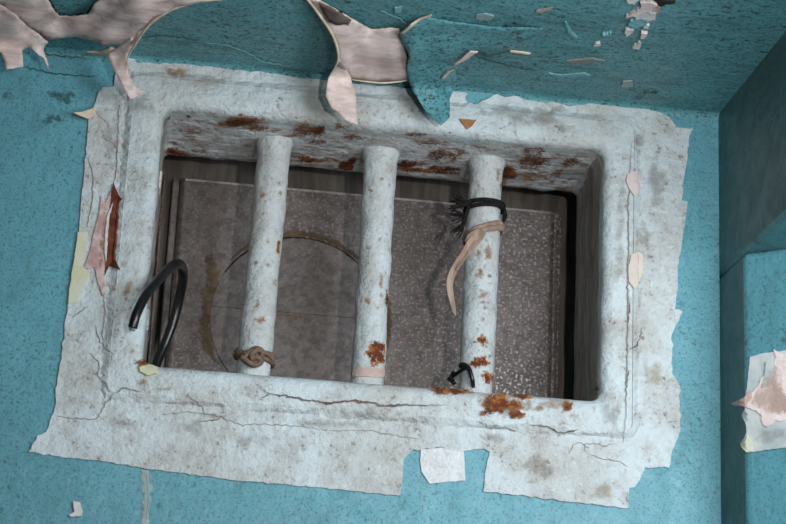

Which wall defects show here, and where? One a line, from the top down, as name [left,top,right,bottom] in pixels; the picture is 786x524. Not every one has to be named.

spalling [625,0,676,50]
corrosion [218,114,268,132]
peeling [0,0,543,267]
corrosion [397,132,466,175]
peeling [29,91,693,509]
corrosion [364,280,392,367]
crack [61,302,141,420]
corrosion [470,356,494,384]
crack [164,396,419,439]
crack [256,384,441,407]
corrosion [481,393,541,419]
spalling [731,349,786,453]